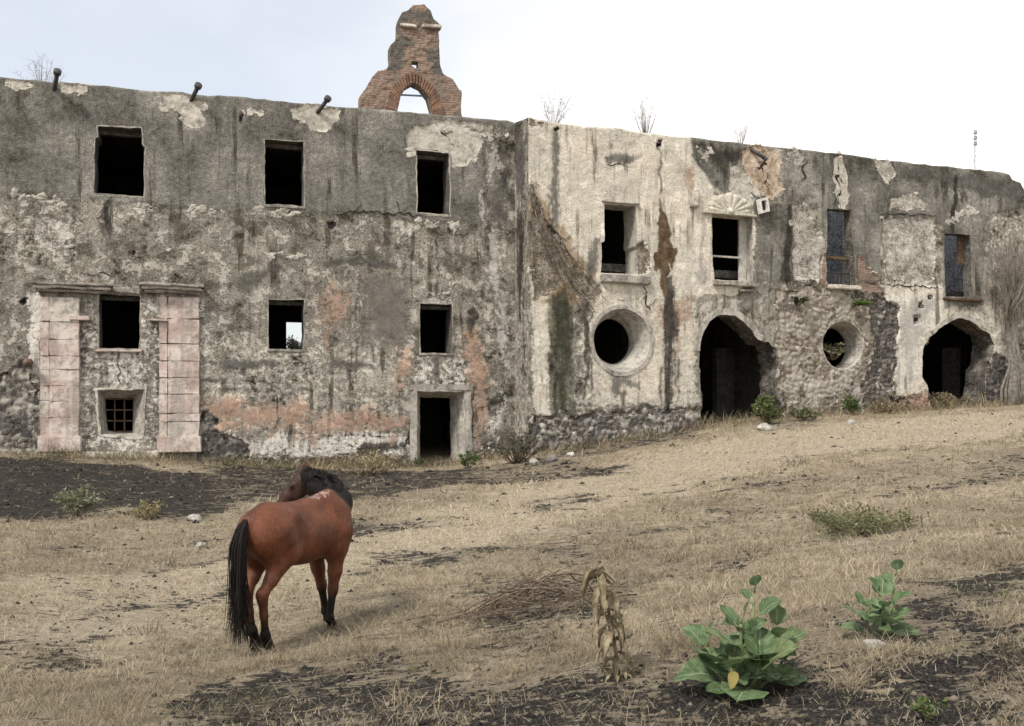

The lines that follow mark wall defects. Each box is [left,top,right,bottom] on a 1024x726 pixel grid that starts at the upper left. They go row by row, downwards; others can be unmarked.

flaking render [5,78,34,91]
flaking render [59,81,92,97]
flaking render [159,92,208,129]
flaking render [291,103,341,132]
flaking render [404,118,509,168]
water stain [694,142,745,184]
flaking render [728,143,805,200]
flaking render [832,150,850,209]
flaking render [874,158,896,185]
water stain [587,237,600,276]
water stain [552,289,590,413]
water stain [657,276,694,411]